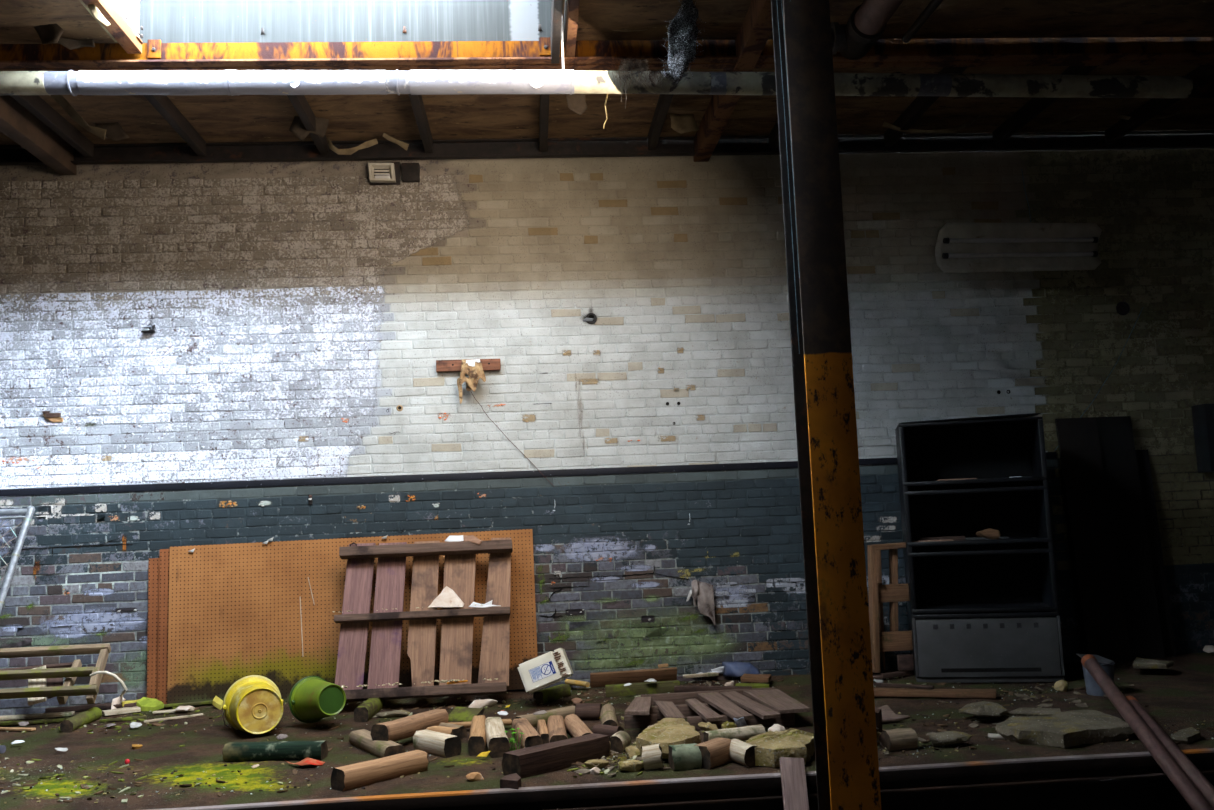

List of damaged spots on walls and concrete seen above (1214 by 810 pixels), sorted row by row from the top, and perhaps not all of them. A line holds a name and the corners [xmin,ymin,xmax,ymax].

peeling [0,175,469,557]